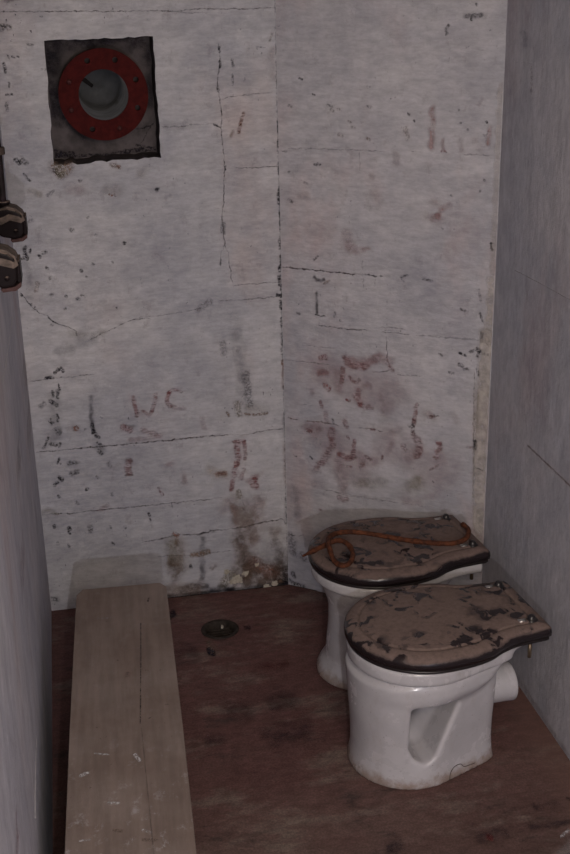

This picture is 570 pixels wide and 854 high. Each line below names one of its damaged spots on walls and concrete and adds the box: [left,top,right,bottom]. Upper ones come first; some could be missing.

crack [214,44,377,370]